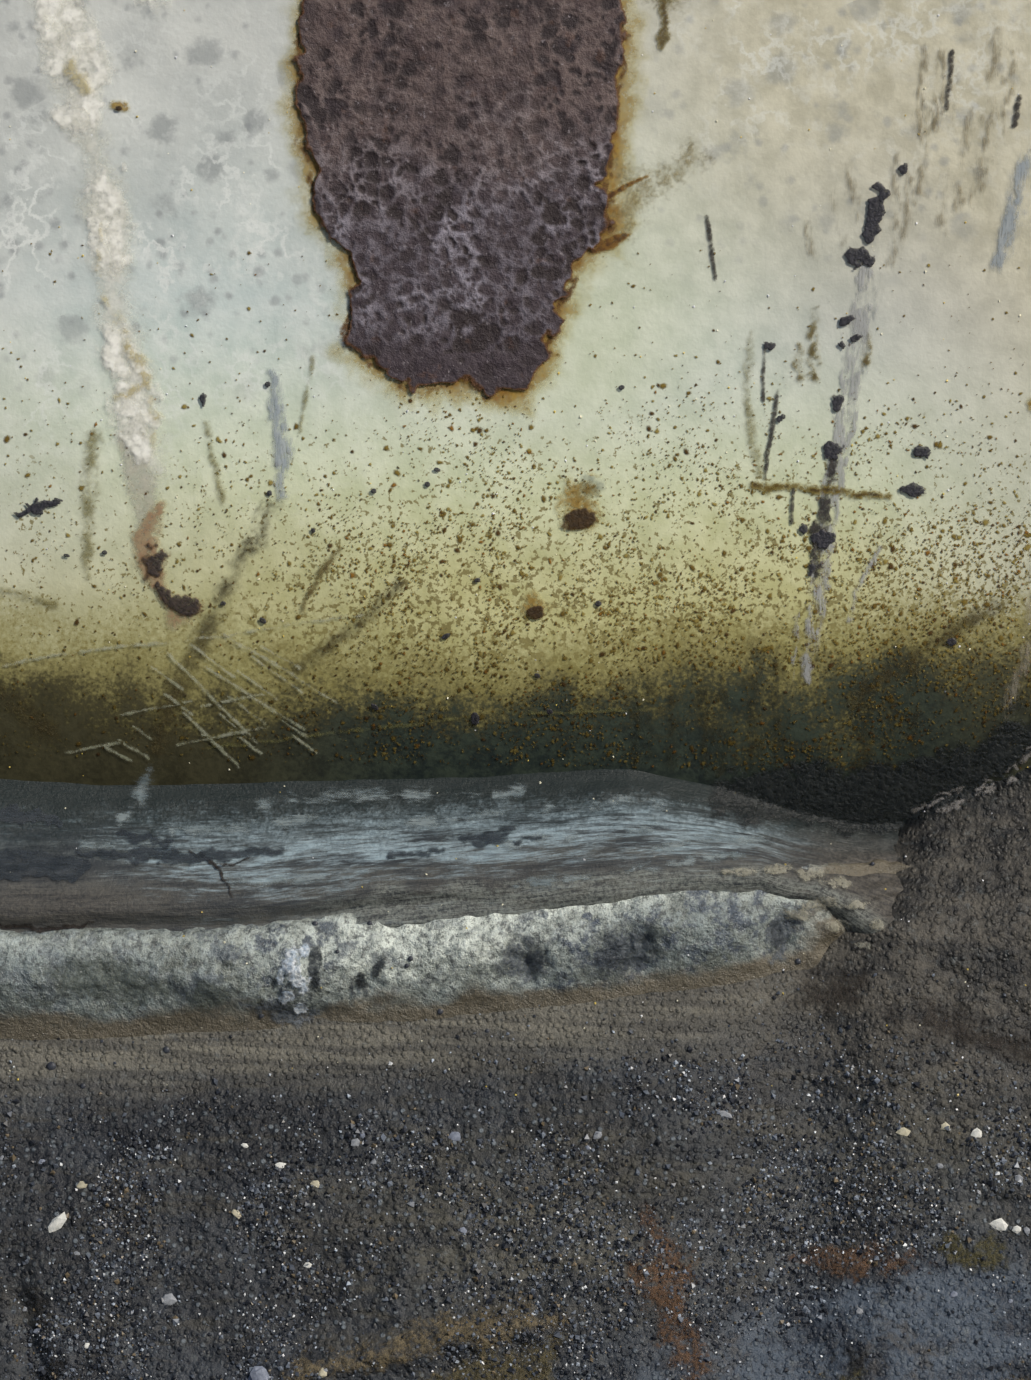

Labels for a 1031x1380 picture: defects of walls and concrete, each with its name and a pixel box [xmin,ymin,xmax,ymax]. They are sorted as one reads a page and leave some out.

corrosion [0,0,1031,771]
leakage [86,431,98,470]
leakage [83,533,93,564]
leakage [151,582,231,753]
leakage [117,770,150,822]
leakage [261,799,312,825]
leakage [329,791,429,800]
leakage [486,787,525,813]